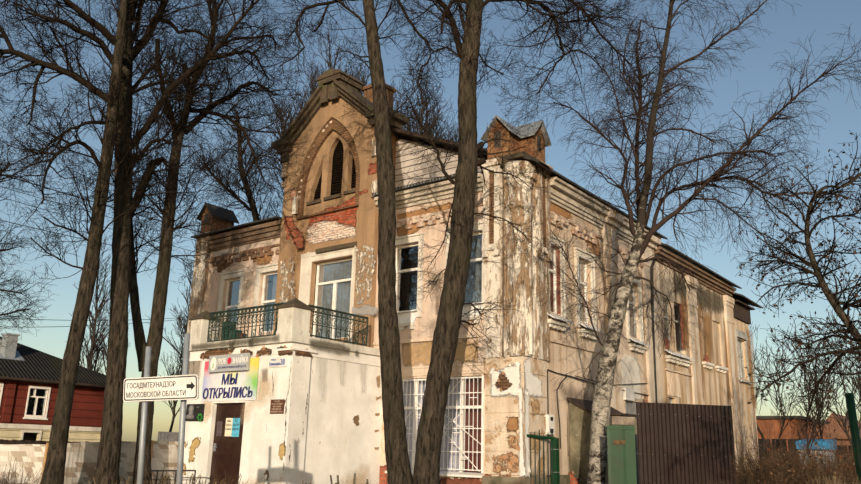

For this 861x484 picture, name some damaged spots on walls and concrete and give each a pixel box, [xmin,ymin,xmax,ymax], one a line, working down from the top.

flaking render [251,189,376,304]
peeling [183,437,201,475]
flaking render [454,340,478,363]
peeling [440,358,544,484]
damp [674,276,724,390]
damp [747,331,757,409]